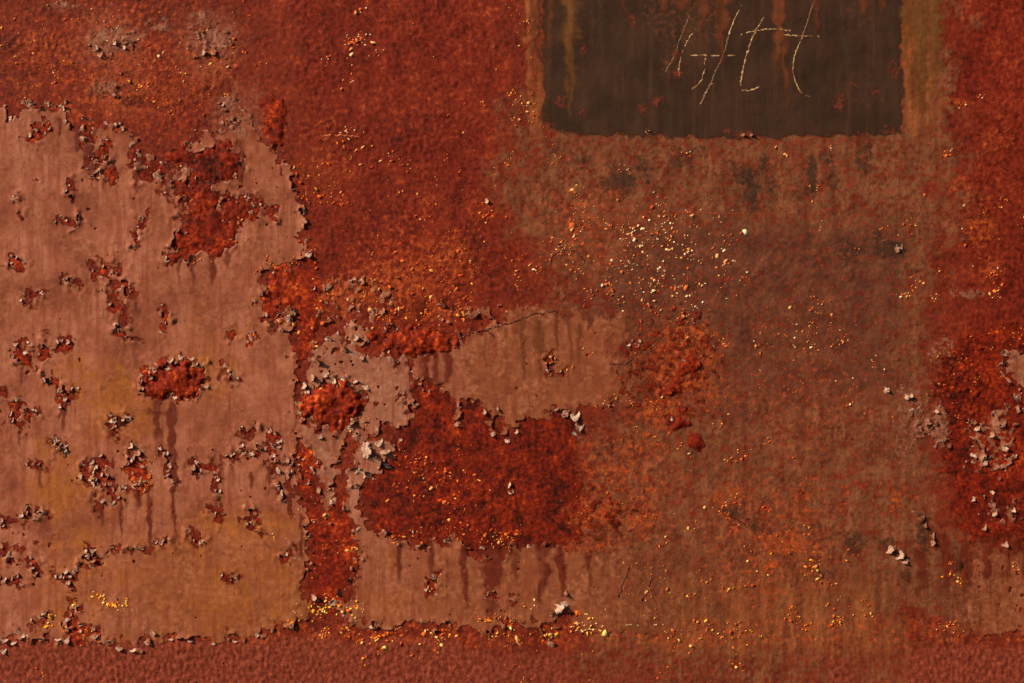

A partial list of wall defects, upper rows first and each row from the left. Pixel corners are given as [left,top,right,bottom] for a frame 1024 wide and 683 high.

rust [7,8,247,179]
rust [321,31,384,90]
peeling [79,414,152,509]
peeling [79,116,280,267]
peeling [139,351,241,402]
rust [287,151,514,384]
peeling [225,245,585,618]
crack [451,310,557,346]
rust [505,192,750,610]
peeling [931,315,1024,548]
peeling [0,537,170,655]
rust [384,436,608,670]